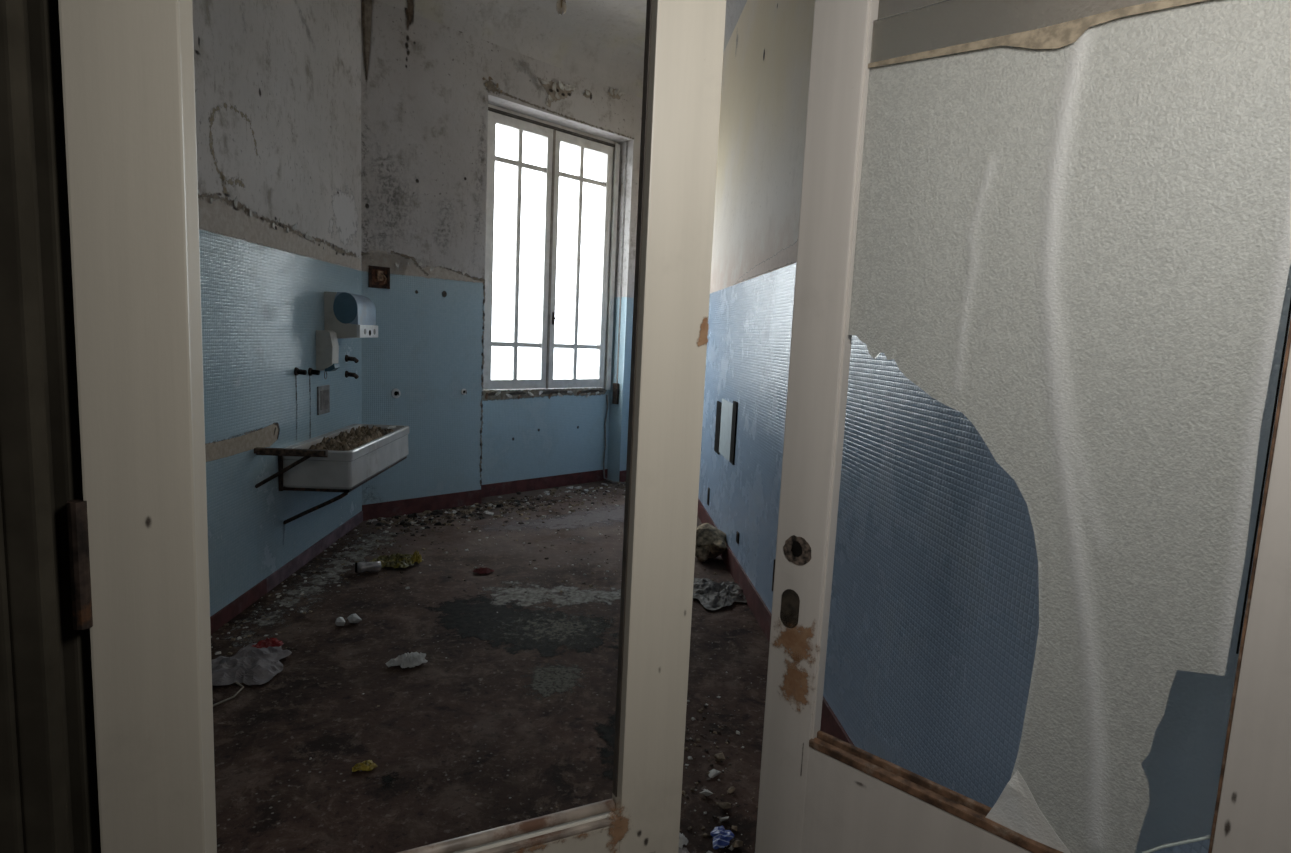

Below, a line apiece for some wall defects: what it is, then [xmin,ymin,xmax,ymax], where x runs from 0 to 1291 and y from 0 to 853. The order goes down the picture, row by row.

damp [405,0,415,68]
peeling [773,621,820,712]